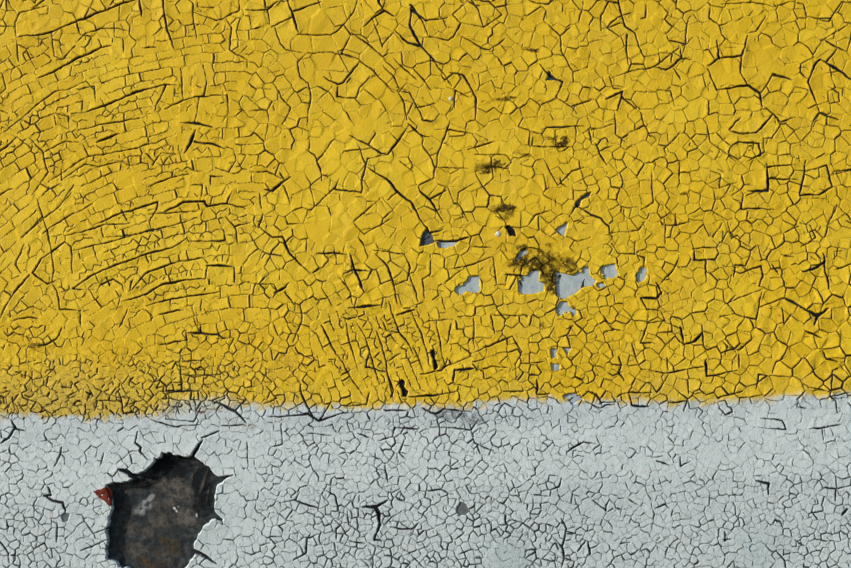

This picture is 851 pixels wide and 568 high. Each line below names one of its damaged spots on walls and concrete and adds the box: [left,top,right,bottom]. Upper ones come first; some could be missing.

crack [709,2,851,120]
peeling [421,229,457,248]
peeling [455,276,480,294]
peeling [518,270,544,295]
peeling [555,264,618,316]
crack [162,327,225,345]
peeling [551,348,571,370]
crack [587,234,750,409]
crack [40,487,66,546]
spalling [93,453,227,568]
crack [290,478,591,568]
crack [777,478,848,567]